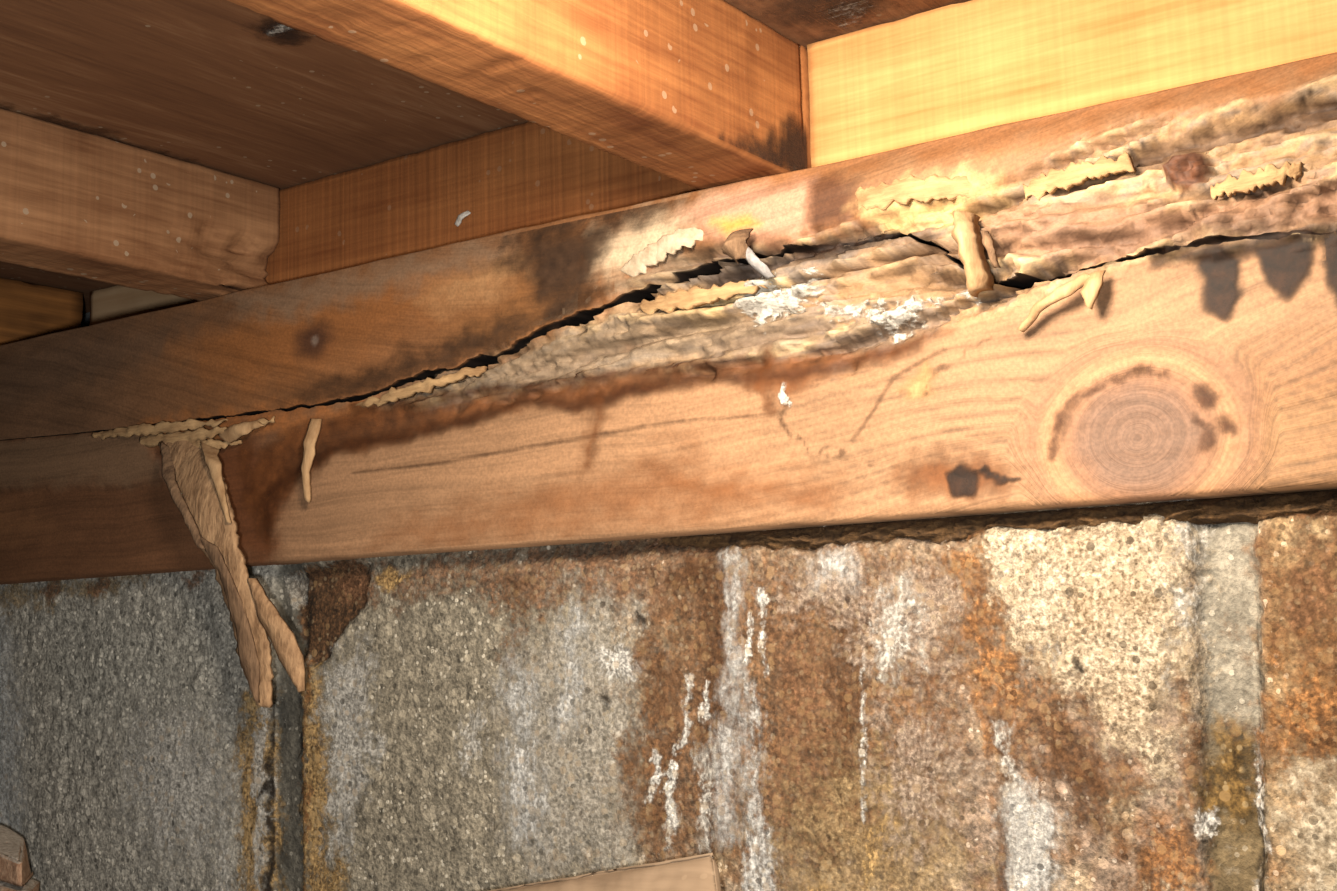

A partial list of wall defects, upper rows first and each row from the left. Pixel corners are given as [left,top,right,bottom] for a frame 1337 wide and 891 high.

water stain [506,216,613,315]
peeling [722,228,776,279]
water stain [351,319,526,389]
crack [778,383,792,420]
water stain [736,502,1337,891]
water stain [644,674,710,848]
water stain [695,747,715,847]